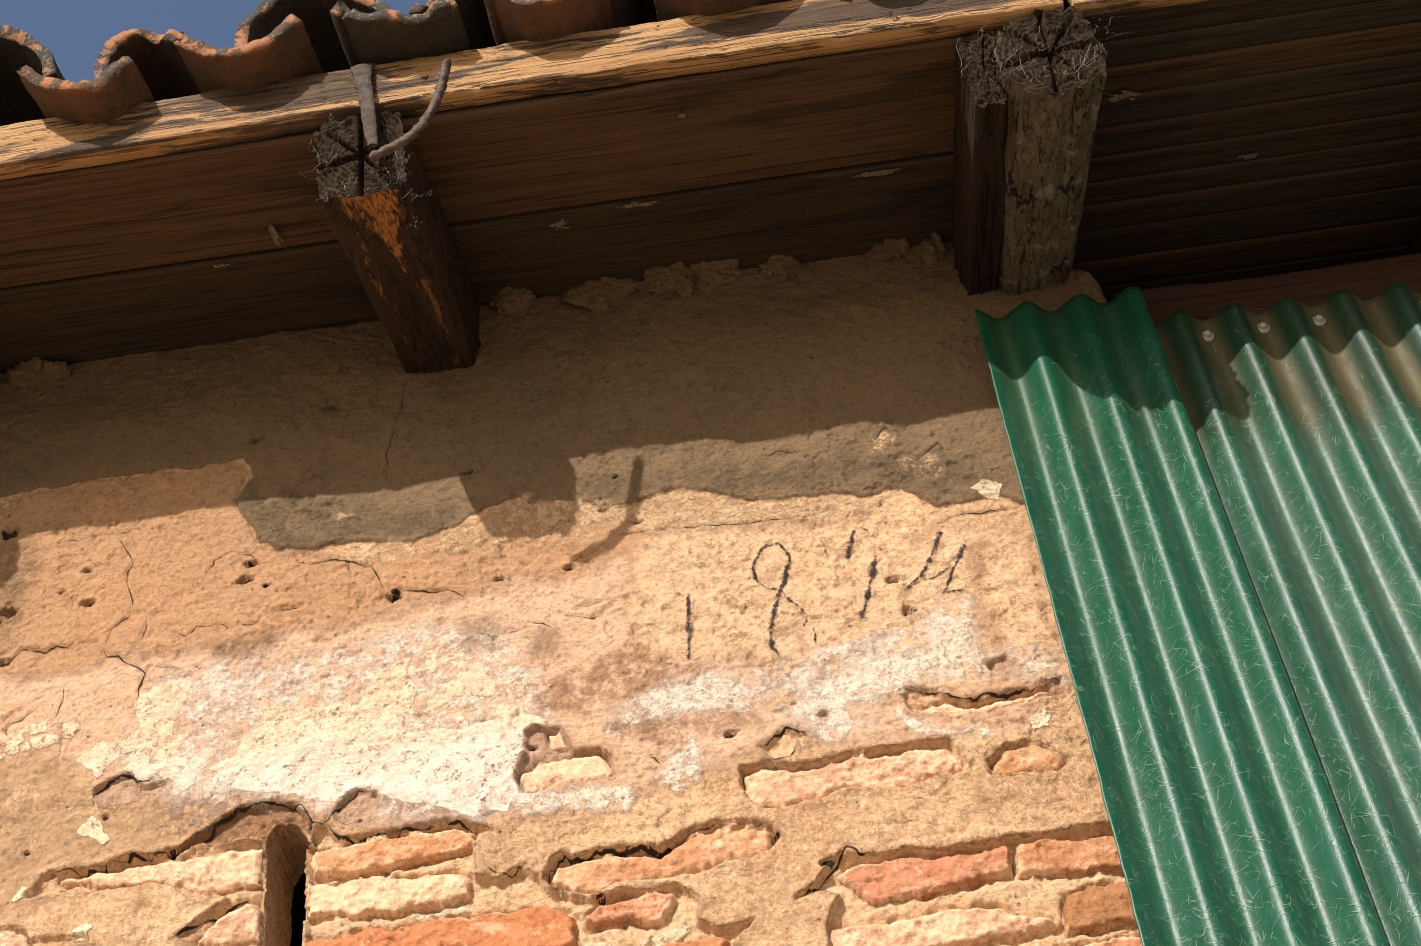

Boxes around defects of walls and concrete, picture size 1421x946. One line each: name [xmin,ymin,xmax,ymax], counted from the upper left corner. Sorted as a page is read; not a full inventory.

crack [296,559,462,596]
crack [12,528,300,697]
crack [3,689,64,756]
peeling [0,706,81,759]
peeling [612,521,1065,808]
crack [905,678,1059,702]
peeling [30,621,780,946]
crack [52,791,487,878]
crack [489,813,714,884]
crack [796,845,874,899]
flaking render [0,929,89,946]